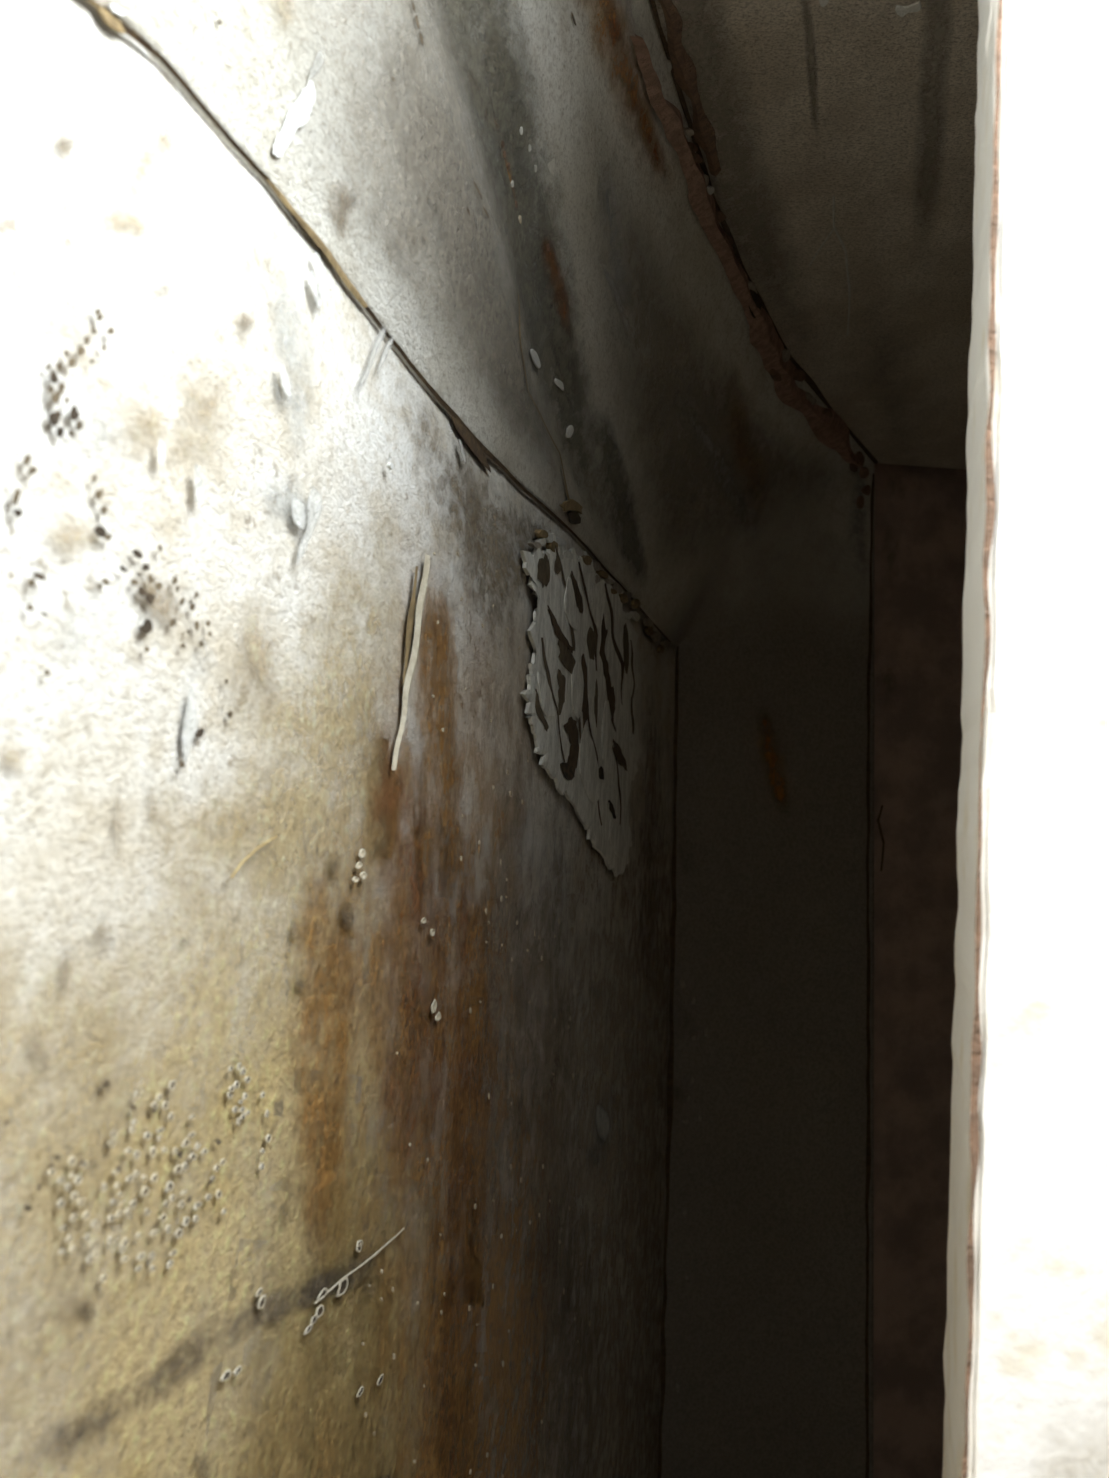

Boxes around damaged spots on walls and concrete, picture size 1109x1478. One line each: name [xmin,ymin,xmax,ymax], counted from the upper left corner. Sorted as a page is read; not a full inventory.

corrosion [591,0,661,165]
corrosion [501,127,537,223]
leakage [442,457,541,620]
leakage [600,425,643,575]
crack [86,0,679,1478]
peeling [519,529,670,877]
crack [649,0,885,1478]